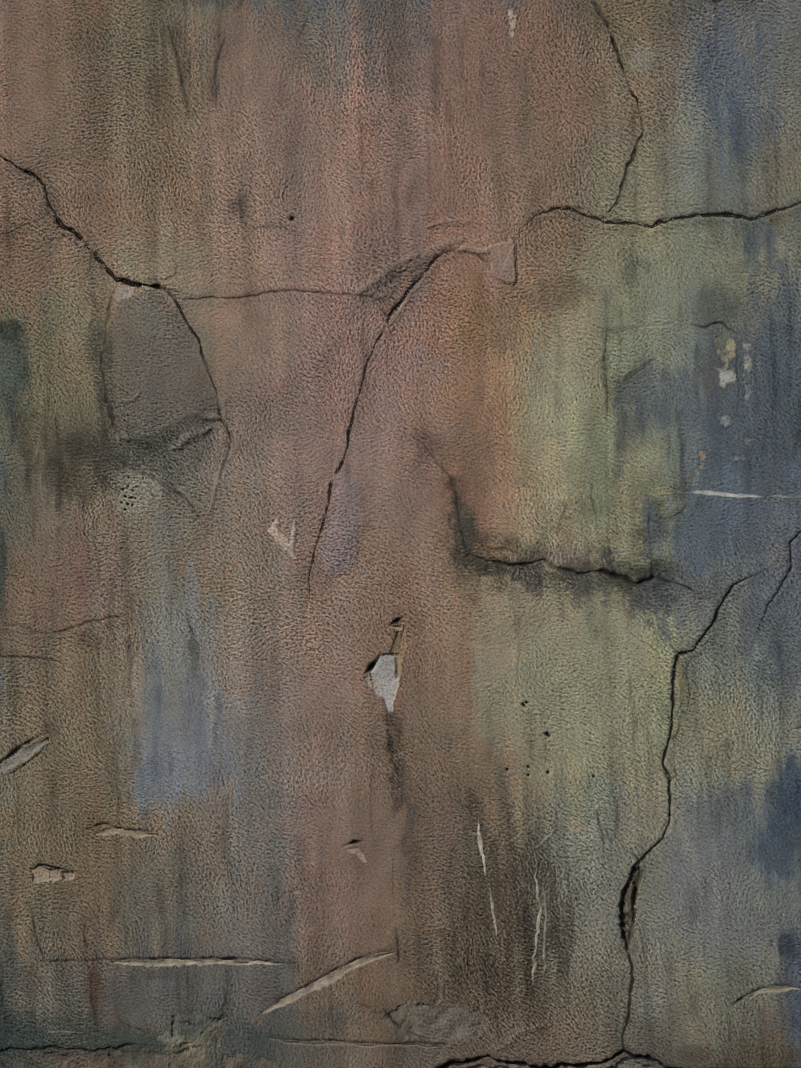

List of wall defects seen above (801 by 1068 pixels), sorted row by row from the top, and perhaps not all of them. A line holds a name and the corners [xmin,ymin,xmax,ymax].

crack [166,27,229,112]
crack [515,0,801,241]
crack [0,155,460,602]
crack [598,324,658,416]
water stain [0,222,375,1059]
spalling [363,616,407,713]
water stain [440,149,801,1068]
spalling [0,724,49,776]
crack [358,443,801,1068]
spalling [29,863,76,884]
hole [261,949,395,1015]